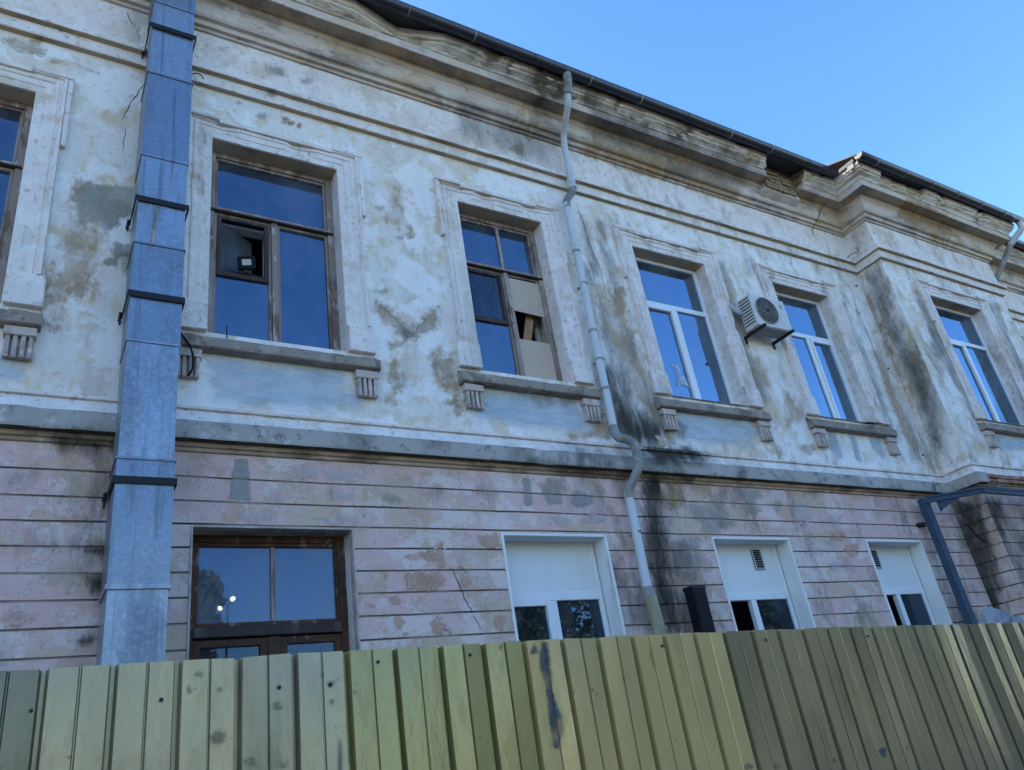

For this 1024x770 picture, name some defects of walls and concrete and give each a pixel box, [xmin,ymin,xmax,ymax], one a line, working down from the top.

water stain [606,286,698,464]
water stain [875,342,920,459]
peeling [393,540,447,635]
water stain [643,476,726,632]
water stain [957,501,1005,609]